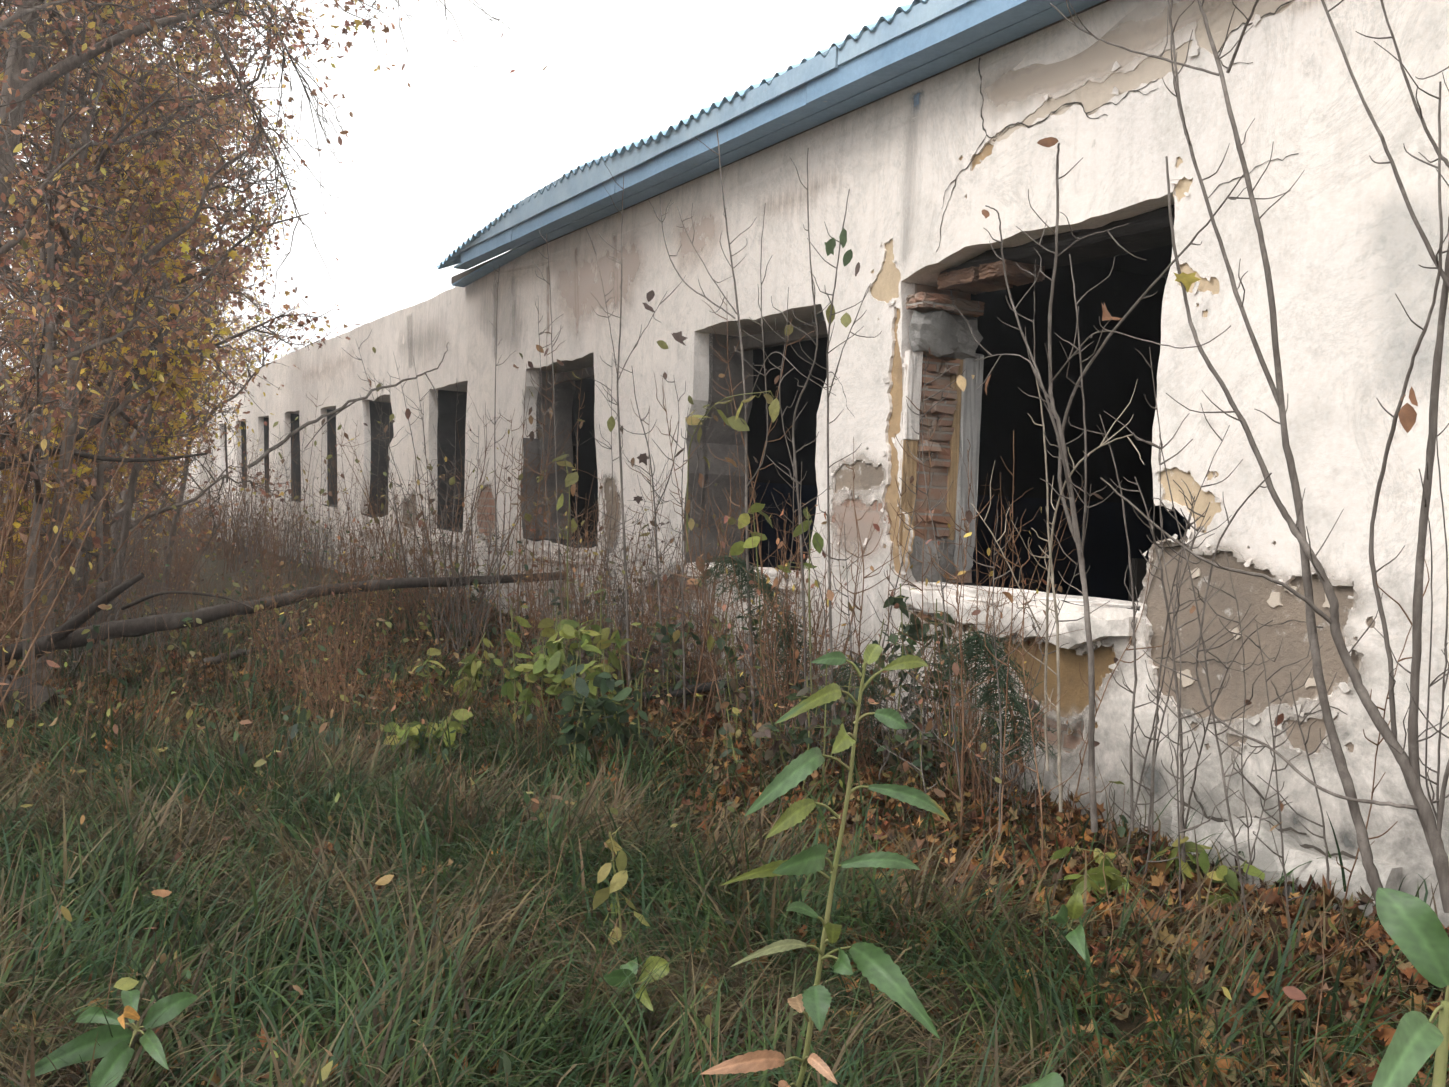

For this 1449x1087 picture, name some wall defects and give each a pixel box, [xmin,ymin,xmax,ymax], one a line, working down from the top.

crack [936,58,1159,252]
peeling [960,0,1295,171]
flaking render [829,239,914,578]
flaking render [996,467,1375,766]